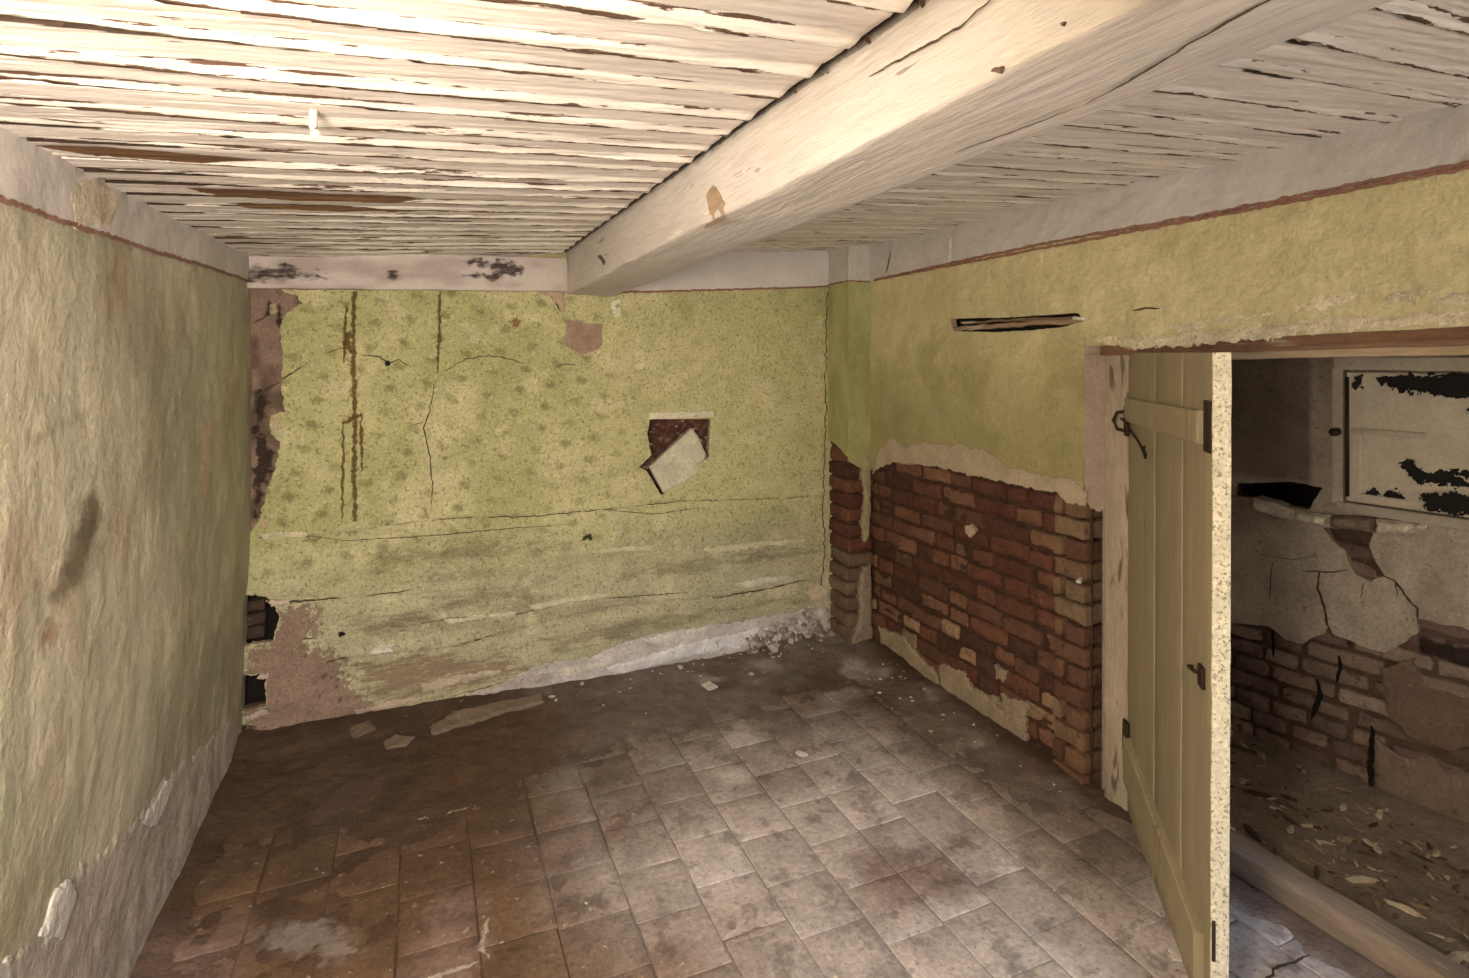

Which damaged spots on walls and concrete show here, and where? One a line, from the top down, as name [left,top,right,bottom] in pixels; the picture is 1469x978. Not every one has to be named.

peeling [37,145,265,163]
peeling [189,188,427,212]
flaking render [538,291,603,356]
flaking render [250,289,307,540]
peeling [1352,371,1469,414]
spalling [640,411,713,494]
peeling [1362,459,1469,516]
spalling [247,595,292,643]
flaking render [354,438,1103,786]
crack [1264,555,1419,638]
peeling [0,673,269,978]